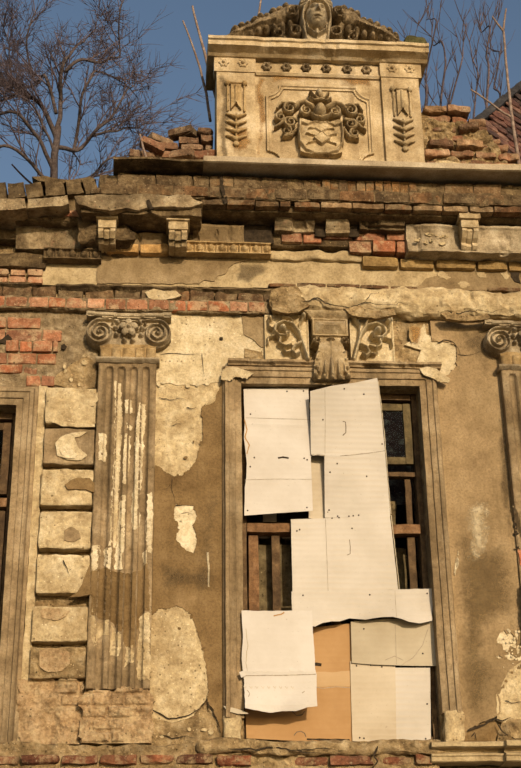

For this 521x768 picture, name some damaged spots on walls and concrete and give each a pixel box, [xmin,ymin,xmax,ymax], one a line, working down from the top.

crack [303,293,418,308]
spalling [0,310,98,407]
peeling [52,270,521,746]
crack [467,717,519,740]